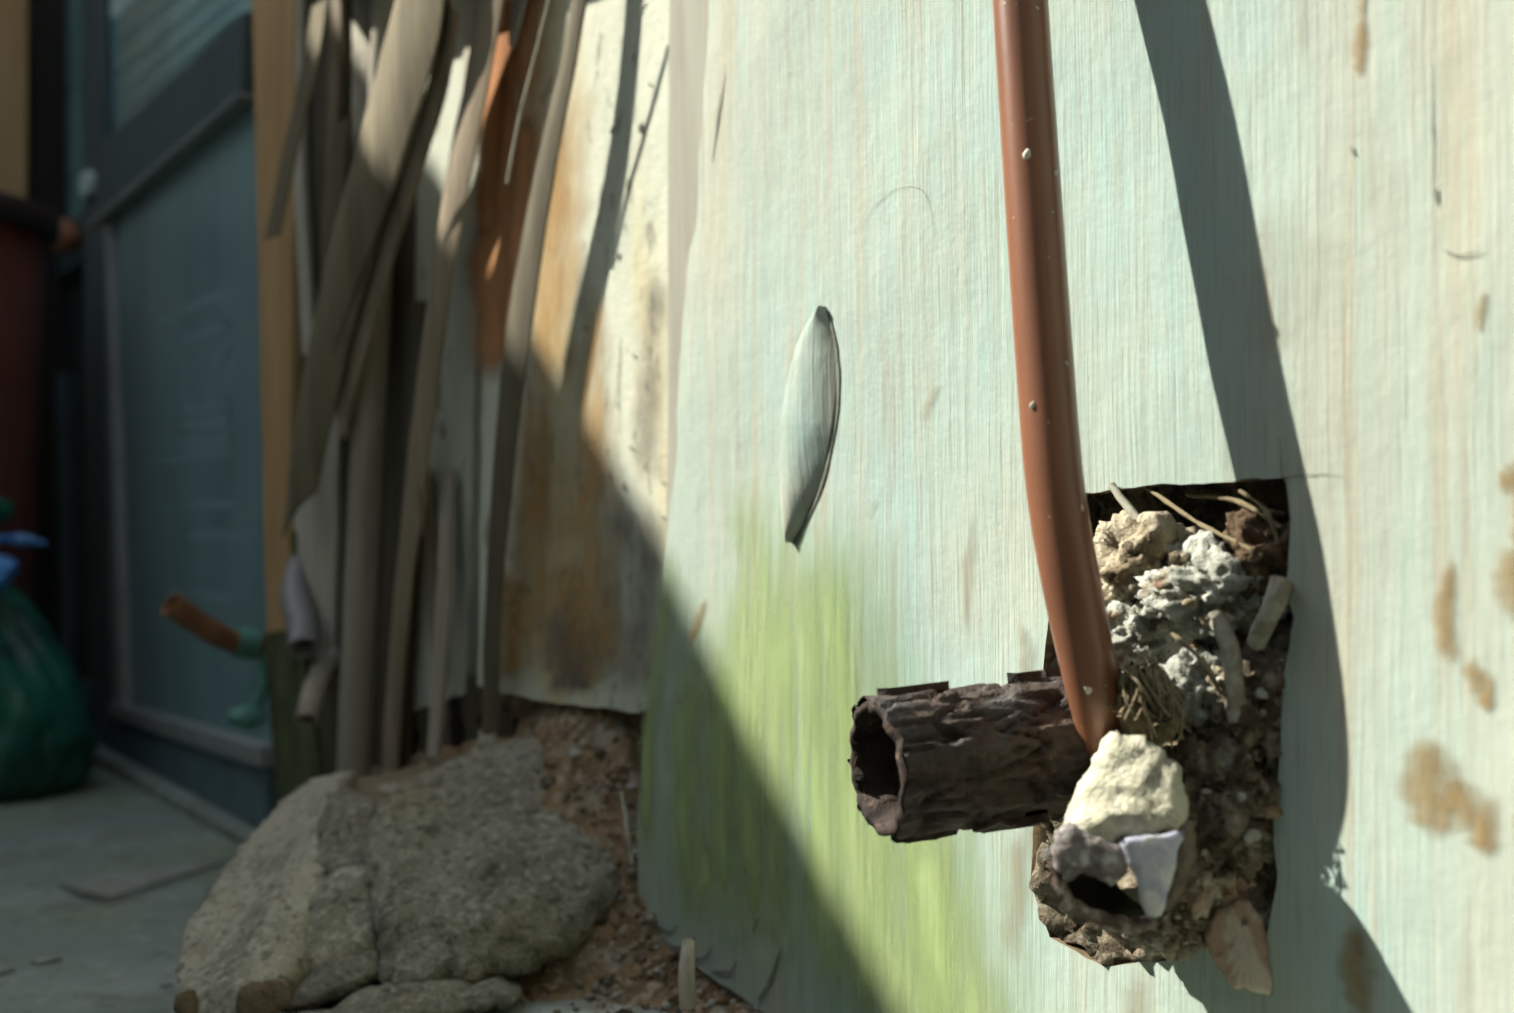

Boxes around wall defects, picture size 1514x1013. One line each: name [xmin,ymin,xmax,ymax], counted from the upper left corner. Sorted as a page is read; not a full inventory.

corrosion [470,0,540,368]
corrosion [534,136,566,363]
corrosion [501,389,609,680]
spalling [1086,479,1286,548]
spalling [1234,612,1294,780]
corrosion [1438,570,1452,651]
corrosion [1466,664,1491,707]
corrosion [1408,747,1492,849]
spalling [1029,812,1277,995]